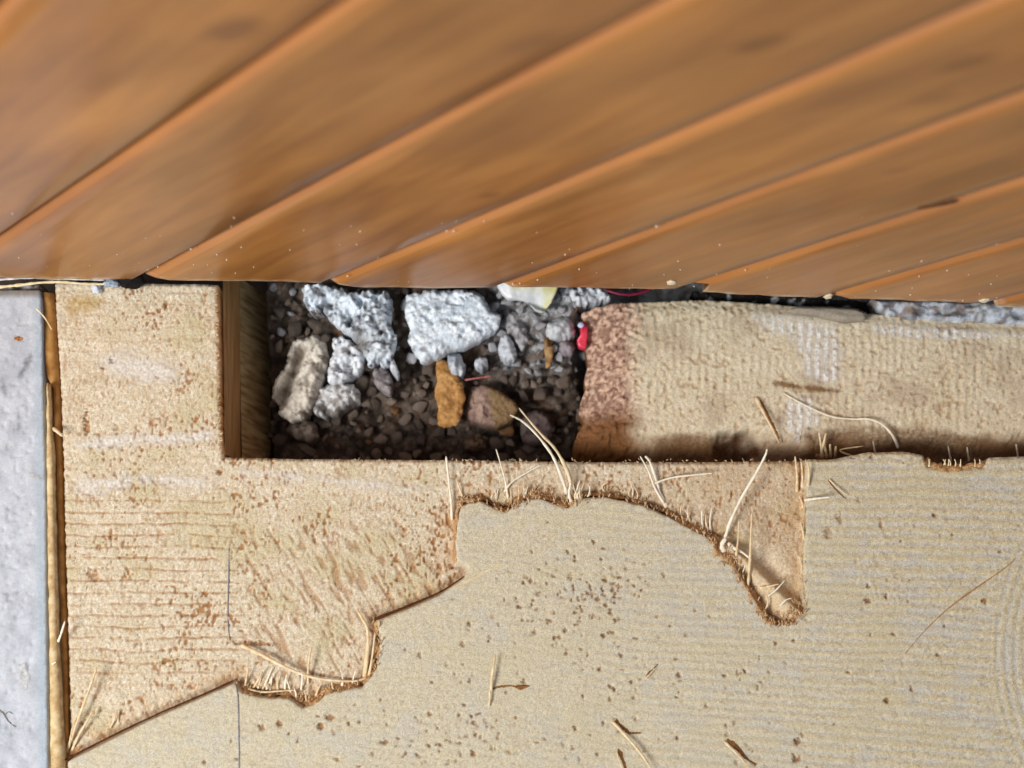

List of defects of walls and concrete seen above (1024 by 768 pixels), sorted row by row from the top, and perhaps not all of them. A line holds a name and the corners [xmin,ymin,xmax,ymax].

spalling [924,457,984,472]
spalling [488,656,529,706]
spalling [612,720,651,768]
spalling [724,739,757,768]